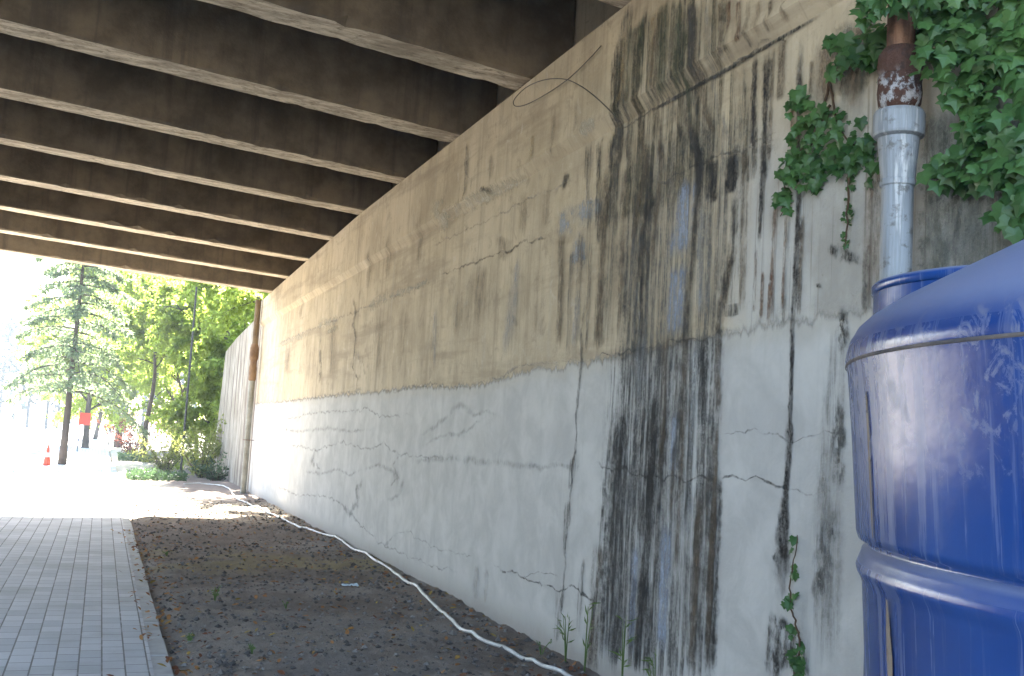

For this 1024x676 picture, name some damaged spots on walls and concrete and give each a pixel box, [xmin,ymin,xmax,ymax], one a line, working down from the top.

damp [921,178,1008,268]
crack [572,317,697,462]
damp [557,0,774,676]
damp [773,179,804,573]
damp [823,405,846,480]
damp [815,475,834,624]
damp [767,618,797,676]